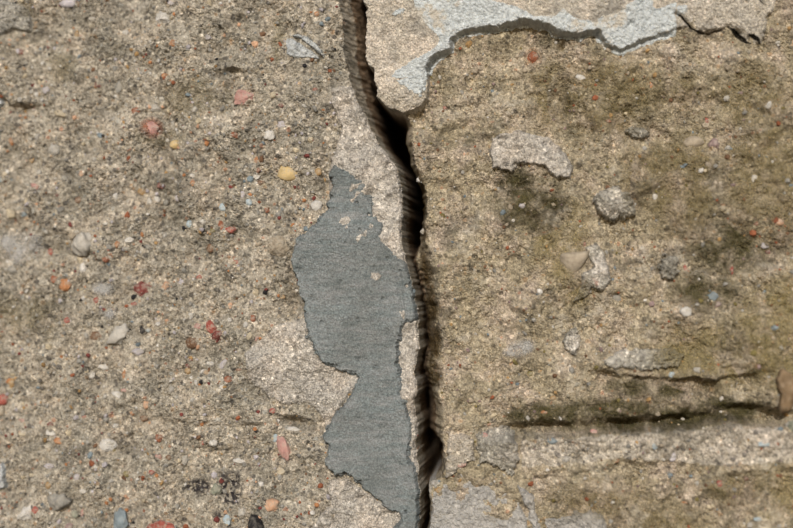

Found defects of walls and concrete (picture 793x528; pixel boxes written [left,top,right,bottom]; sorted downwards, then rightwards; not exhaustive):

peeling [363,0,775,97]
crack [350,0,443,528]
peeling [236,86,613,528]
crack [519,414,699,441]
crack [599,366,754,388]
crack [740,413,790,429]